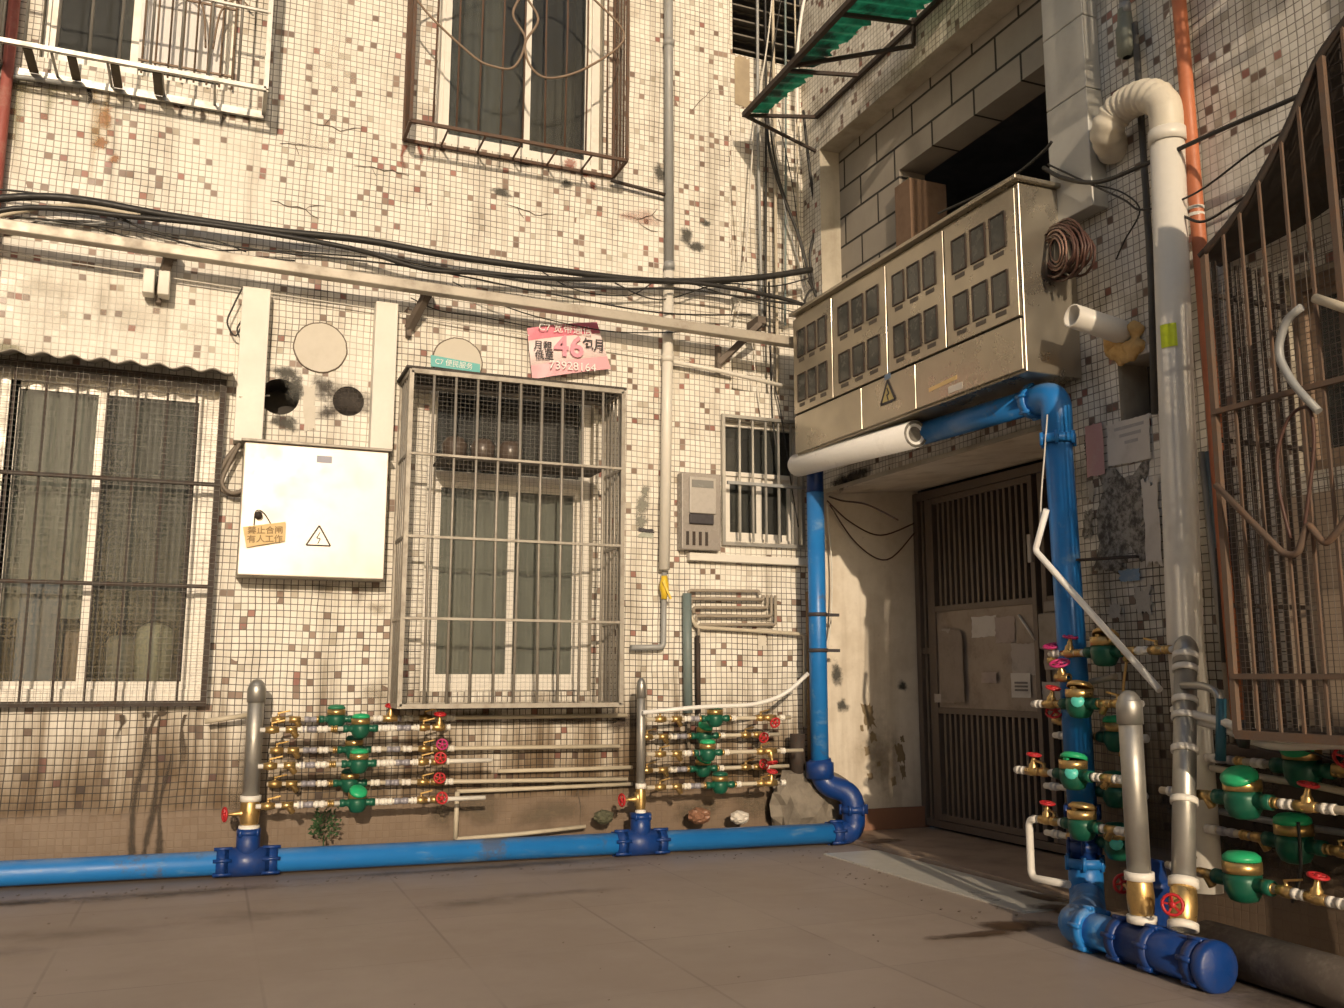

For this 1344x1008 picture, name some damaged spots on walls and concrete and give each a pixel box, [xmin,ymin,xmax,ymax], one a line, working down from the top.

corrosion [94,109,119,162]
flaking render [1082,459,1149,575]
water stain [128,711,187,855]